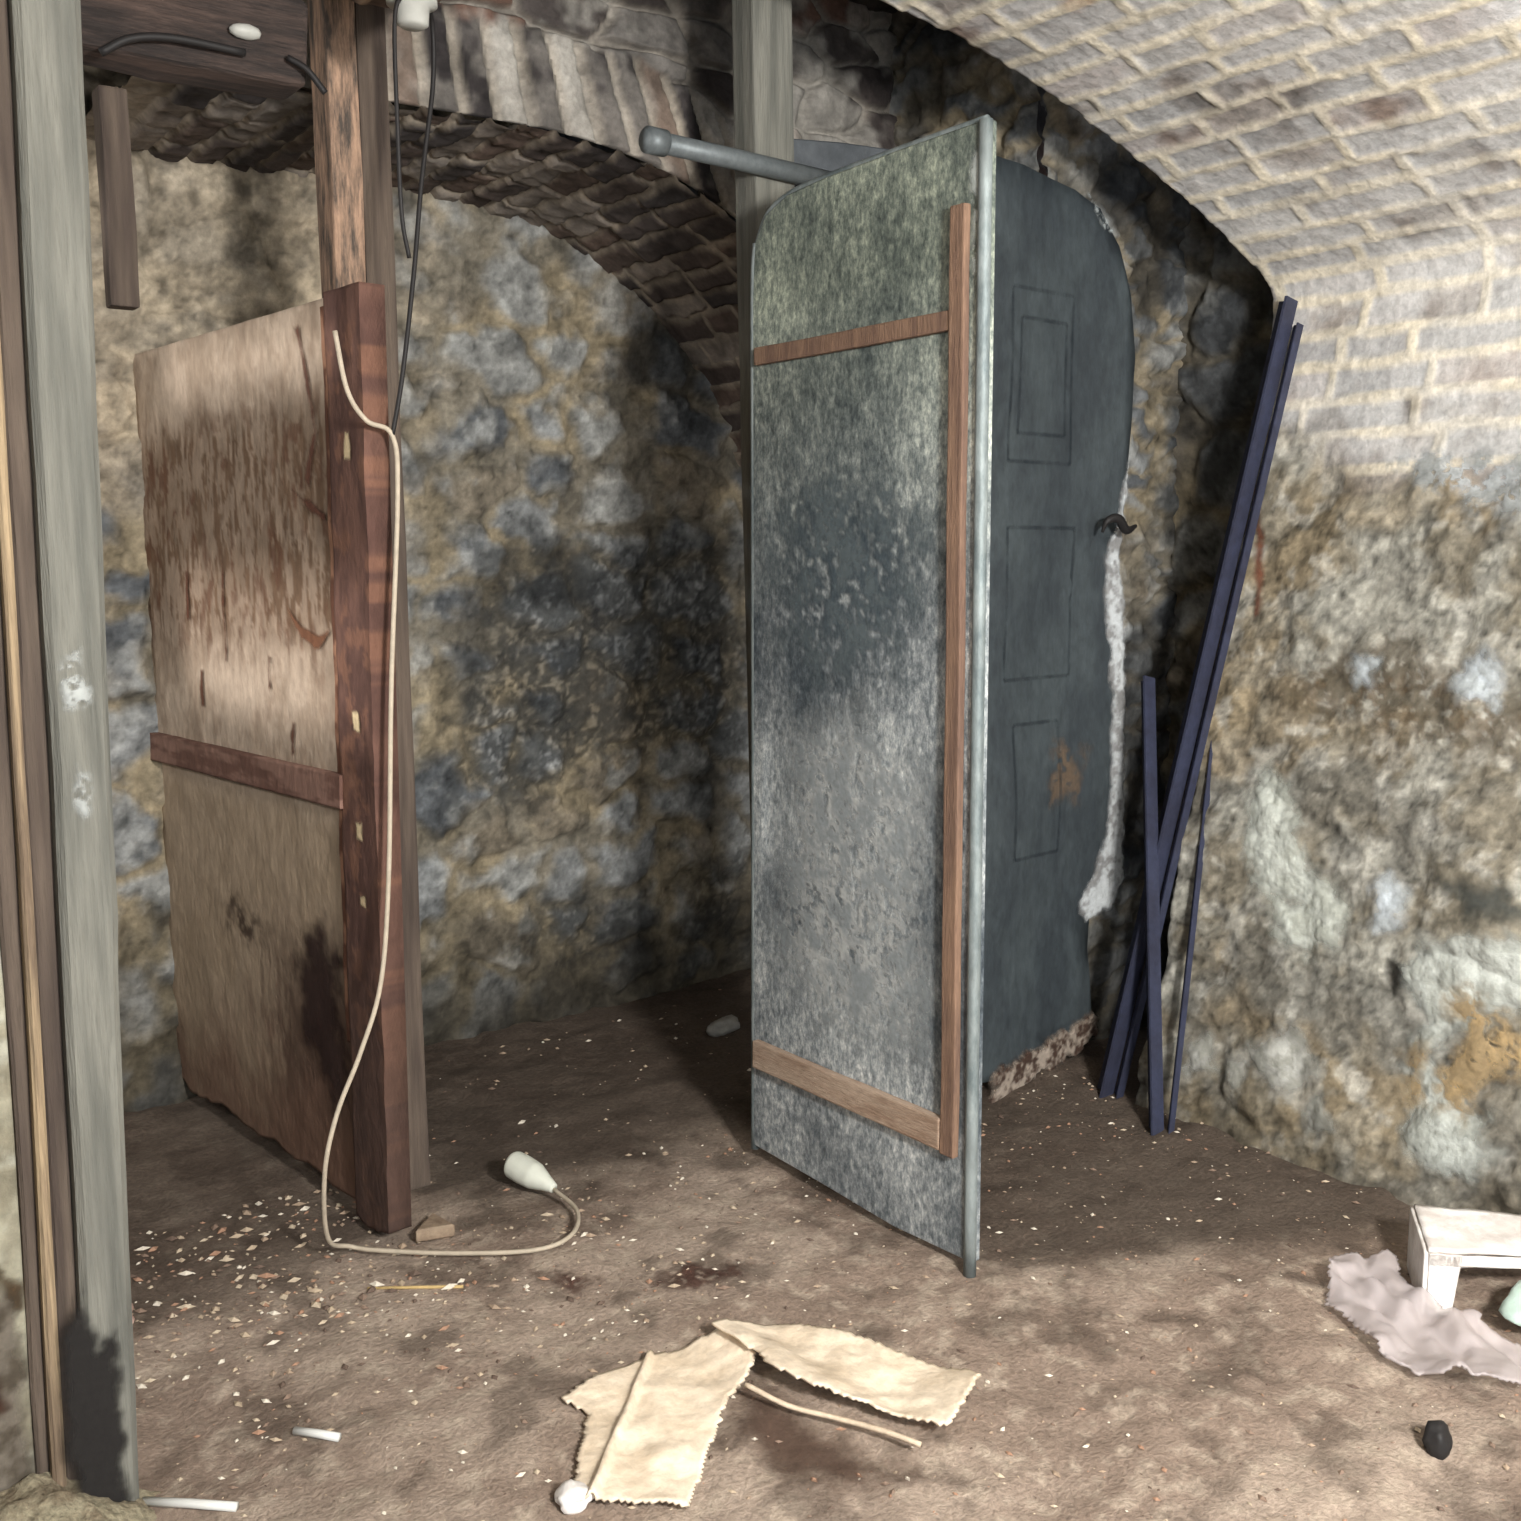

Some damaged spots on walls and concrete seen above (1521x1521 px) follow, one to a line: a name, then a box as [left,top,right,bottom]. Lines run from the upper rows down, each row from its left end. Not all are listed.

leakage [228,898,255,939]
leakage [295,924,347,1110]
leakage [0,1270,35,1492]
leakage [63,1309,131,1502]